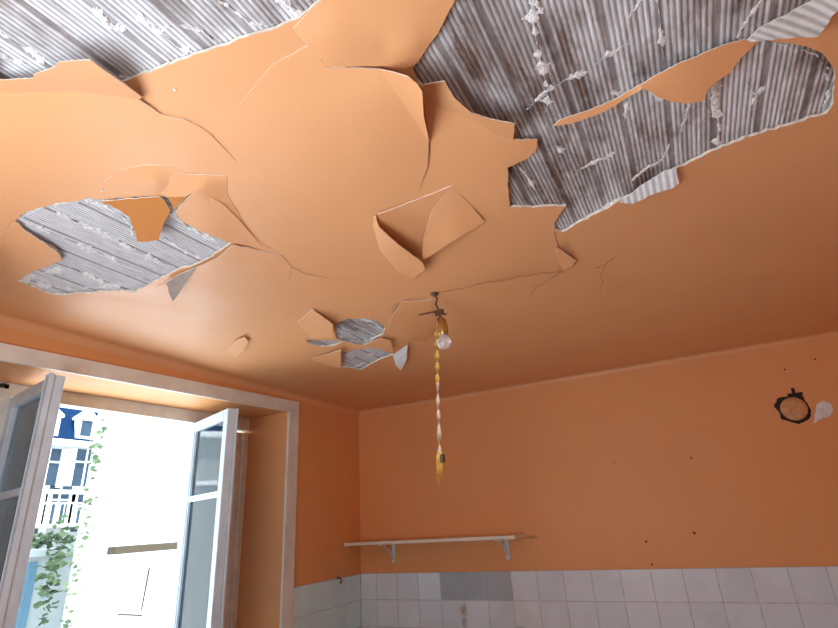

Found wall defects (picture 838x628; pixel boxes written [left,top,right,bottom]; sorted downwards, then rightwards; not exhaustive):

peeling [0,0,838,279]
peeling [0,173,284,301]
peeling [297,299,435,370]
crack [441,270,564,294]